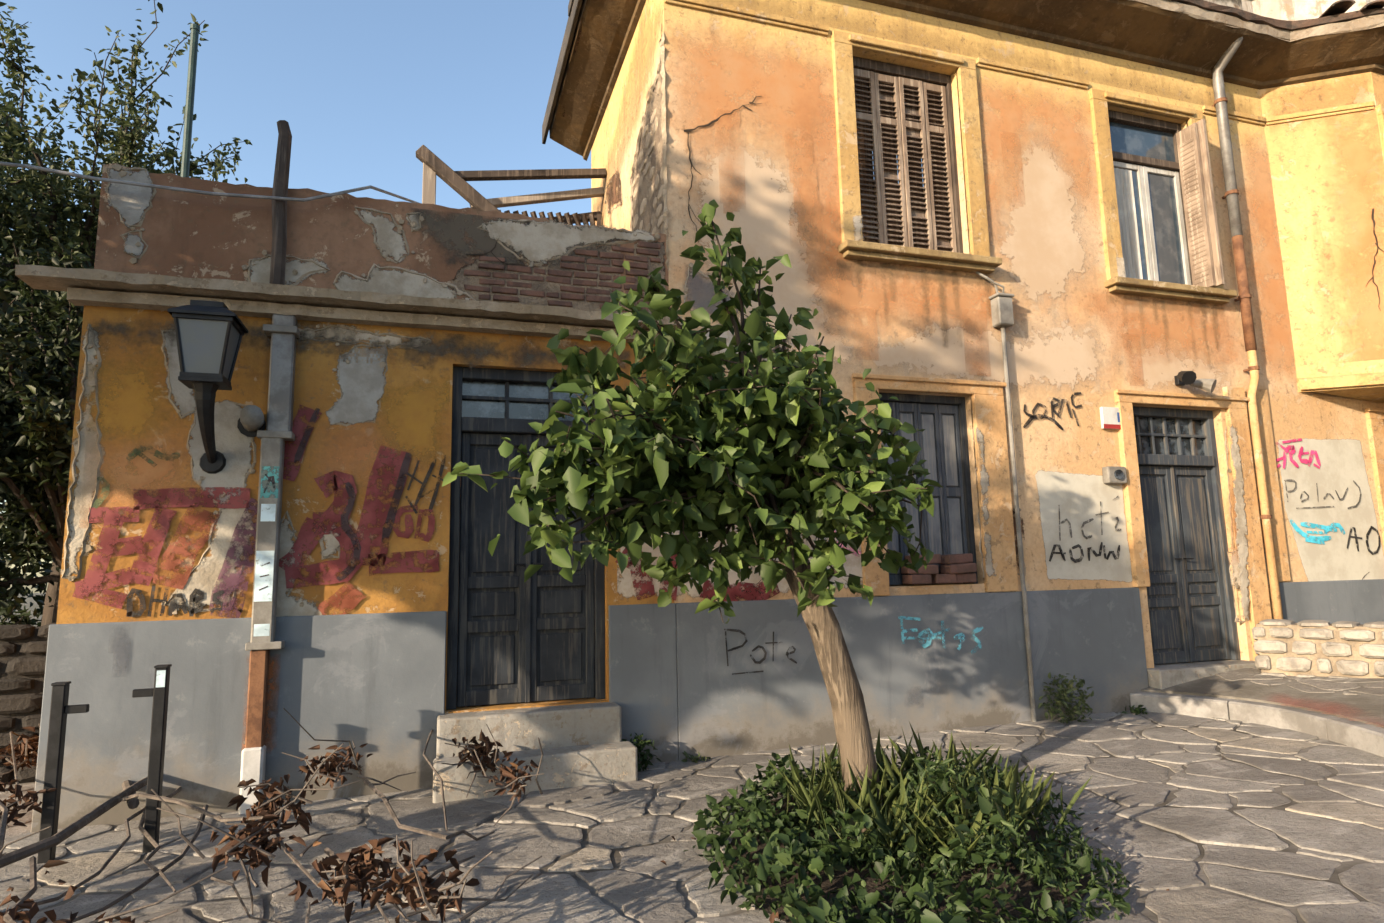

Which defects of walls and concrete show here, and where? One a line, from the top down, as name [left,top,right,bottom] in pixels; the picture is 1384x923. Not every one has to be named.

crack [684,96,762,242]
flaking render [450,234,665,314]
peeling [683,262,790,361]
crack [1366,208,1384,311]
peeling [61,324,106,582]